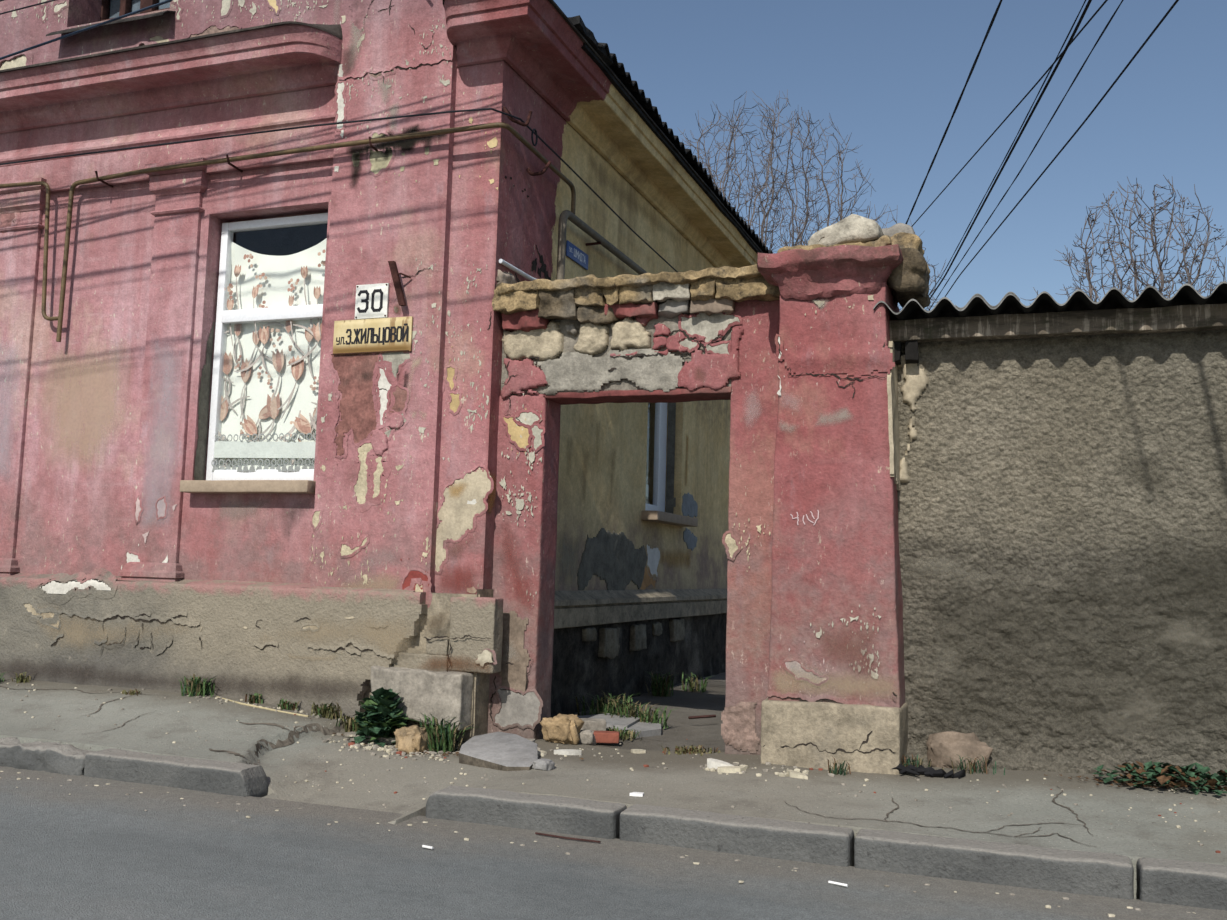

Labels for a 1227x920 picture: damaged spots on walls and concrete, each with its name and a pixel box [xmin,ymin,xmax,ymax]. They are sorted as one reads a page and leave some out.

peeling [36,0,69,28]
flaking render [131,0,328,48]
flaking render [0,49,33,70]
flaking render [460,264,520,294]
flaking render [502,312,742,395]
peeling [309,291,545,608]
flaking render [18,544,142,631]
peeling [640,542,661,590]
crack [50,609,202,655]
crack [210,720,351,765]
crack [763,690,897,754]
crack [785,785,1097,847]